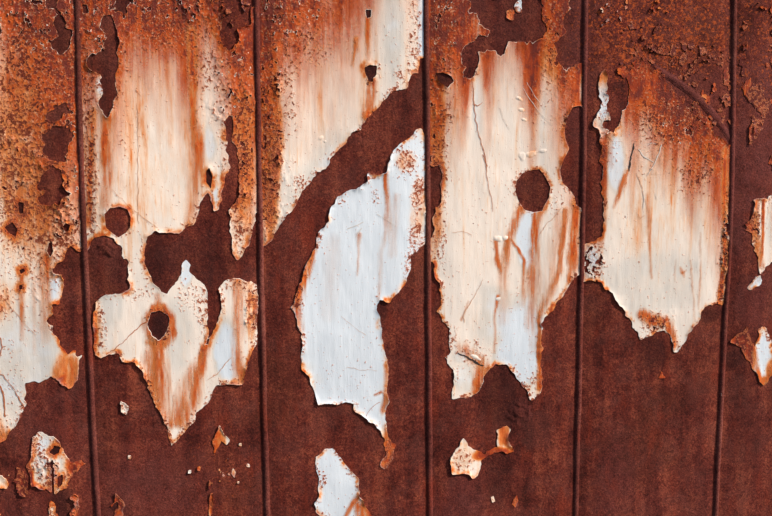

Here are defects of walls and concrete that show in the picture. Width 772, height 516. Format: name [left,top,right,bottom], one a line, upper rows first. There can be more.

crack [0,338,24,417]
peeling [5,222,32,253]
peeling [2,103,78,221]
peeling [0,246,95,516]
corrosion [146,299,213,427]
corrosion [0,0,375,230]
peeling [88,58,427,516]
corrosion [429,0,490,165]
corrosion [494,198,579,390]
corrosion [510,0,582,144]
peeling [430,0,772,516]
corrosion [618,56,731,305]